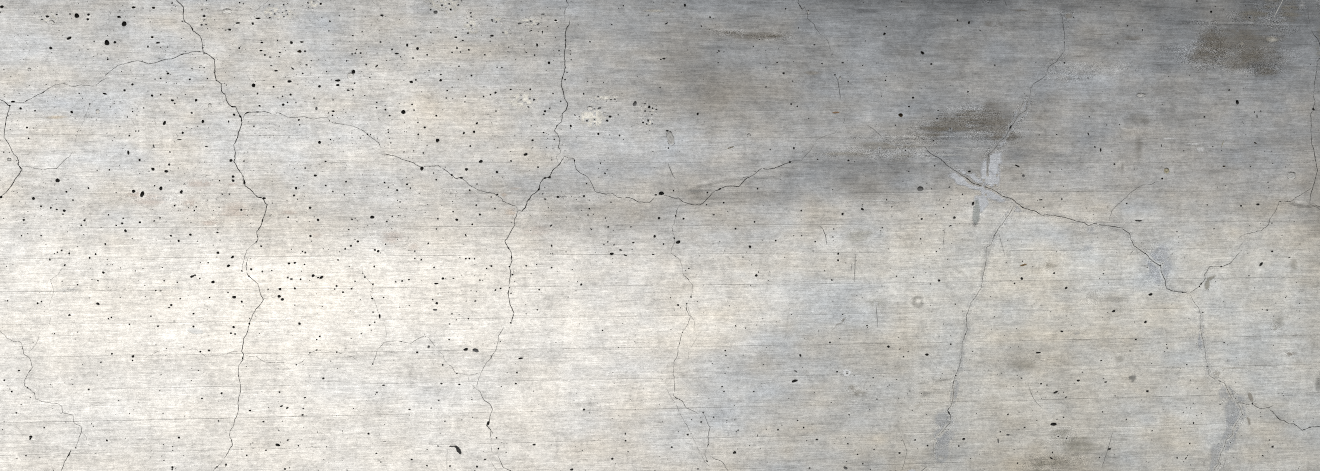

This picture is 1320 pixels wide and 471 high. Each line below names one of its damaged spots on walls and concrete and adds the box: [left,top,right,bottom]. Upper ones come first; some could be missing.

crack [0,0,845,471]
crack [869,13,1320,471]